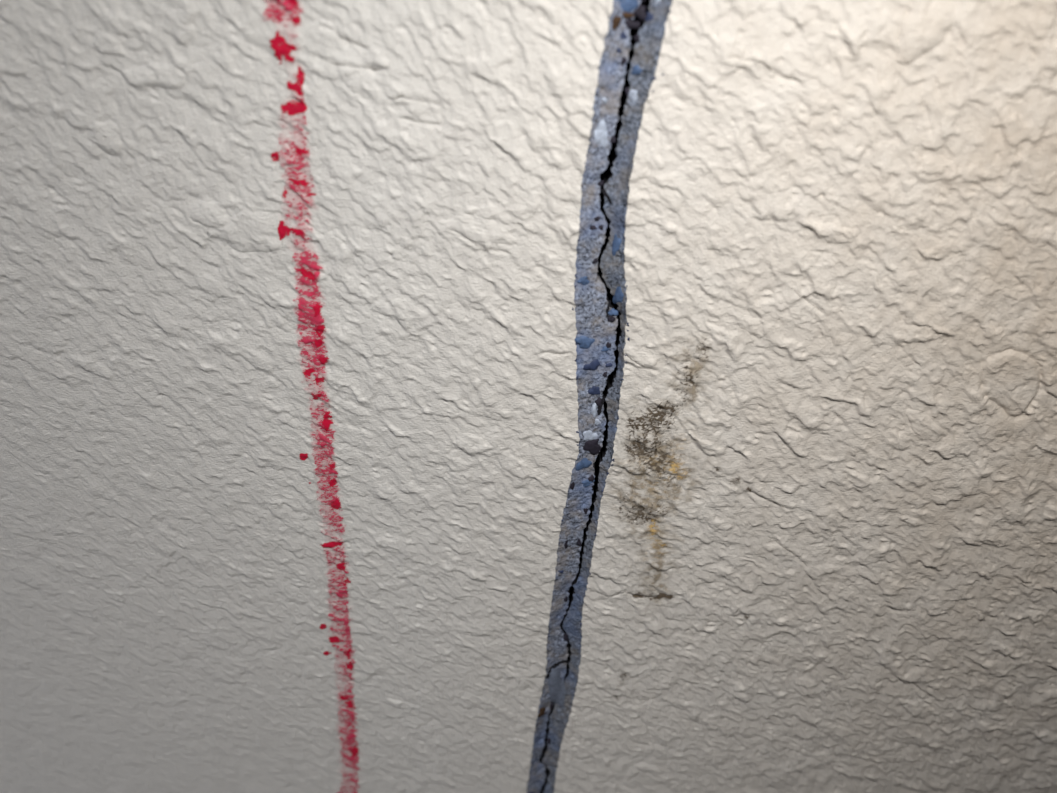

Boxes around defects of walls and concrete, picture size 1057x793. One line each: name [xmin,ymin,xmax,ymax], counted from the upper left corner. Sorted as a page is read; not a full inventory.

crack [527,0,673,793]
leakage [620,432,691,516]
leakage [633,529,673,600]